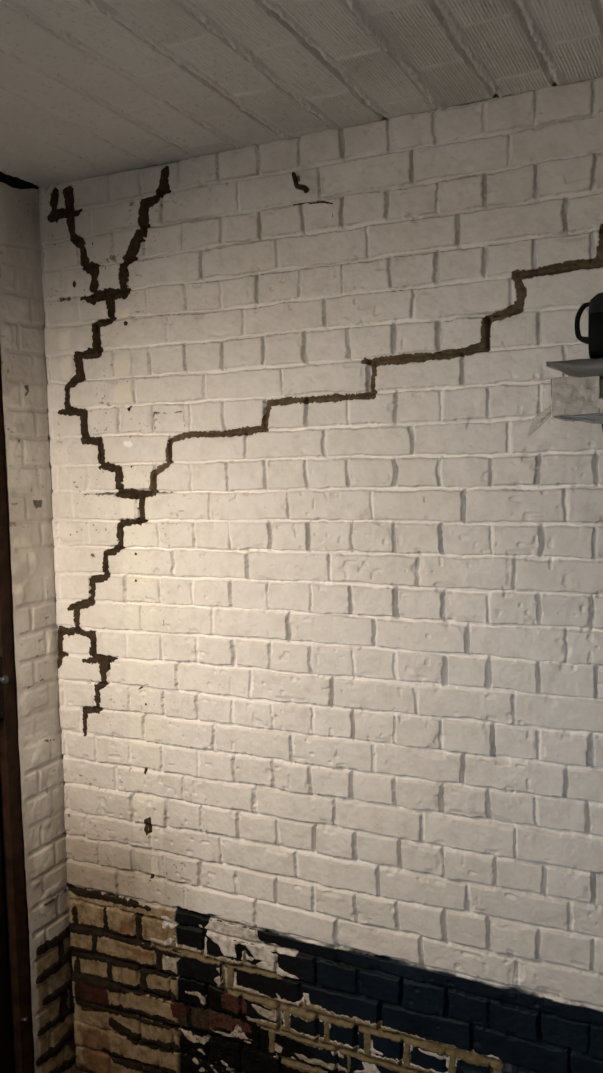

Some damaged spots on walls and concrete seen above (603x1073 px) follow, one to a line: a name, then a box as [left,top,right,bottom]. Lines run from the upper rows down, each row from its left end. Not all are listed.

crack [0,166,603,736]
peeling [148,915,517,1073]